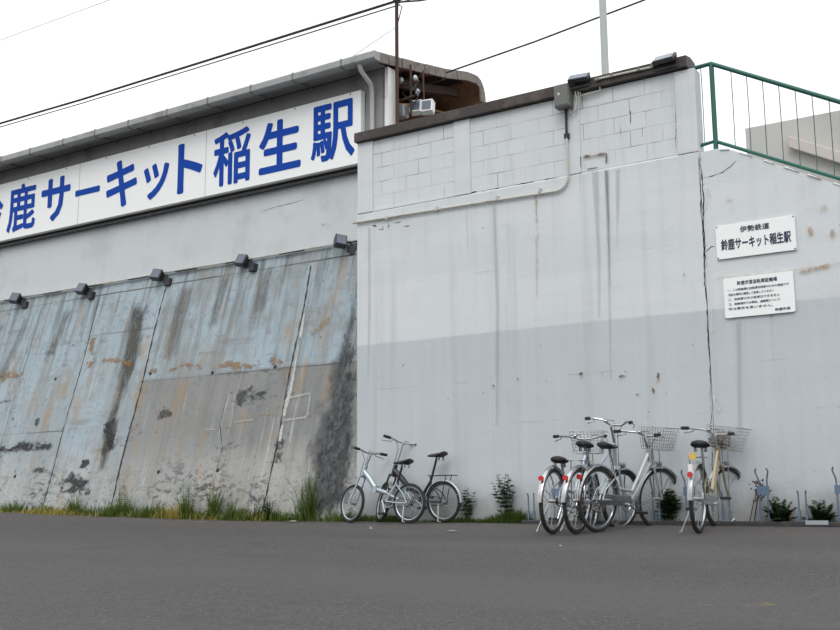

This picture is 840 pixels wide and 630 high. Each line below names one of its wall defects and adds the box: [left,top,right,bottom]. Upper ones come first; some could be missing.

crack [698,157,736,429]
leakage [59,459,90,495]
leakage [101,308,146,468]
leakage [306,335,356,514]